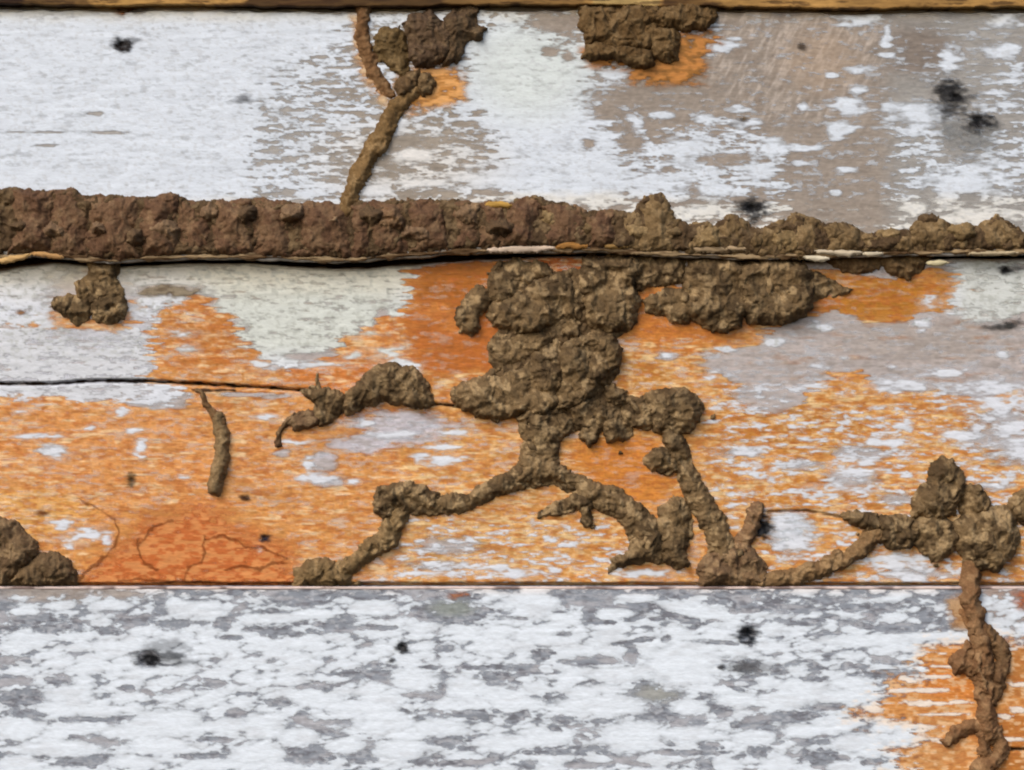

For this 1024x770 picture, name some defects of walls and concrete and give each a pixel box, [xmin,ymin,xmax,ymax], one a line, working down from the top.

peeling [0,10,410,204]
peeling [359,10,1024,231]
peeling [521,258,582,272]
crack [0,379,300,392]
peeling [0,261,1024,770]